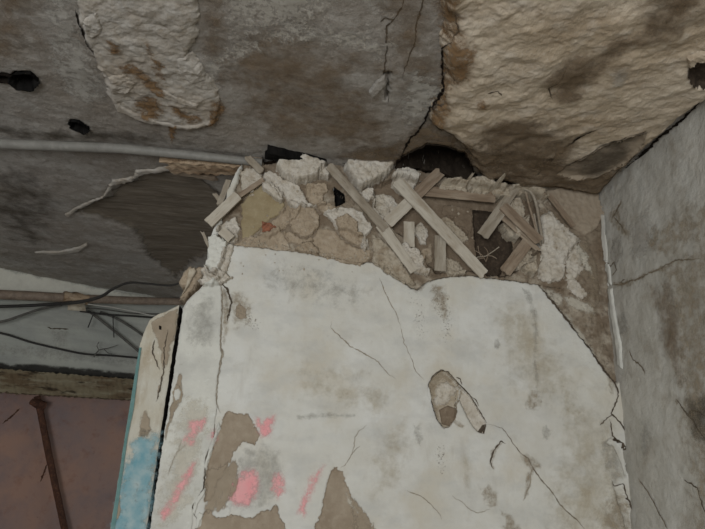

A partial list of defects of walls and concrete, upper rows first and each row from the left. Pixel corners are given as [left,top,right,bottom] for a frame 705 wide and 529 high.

peeling [42,0,220,130]
leakage [229,0,391,54]
crack [401,16,460,157]
leakage [547,0,698,103]
leakage [344,122,629,194]
spalling [205,143,604,315]
crack [214,282,233,432]
spalling [427,370,487,434]
crack [535,284,626,450]
peeling [192,411,285,529]
peeling [314,467,374,529]
crack [490,424,584,528]